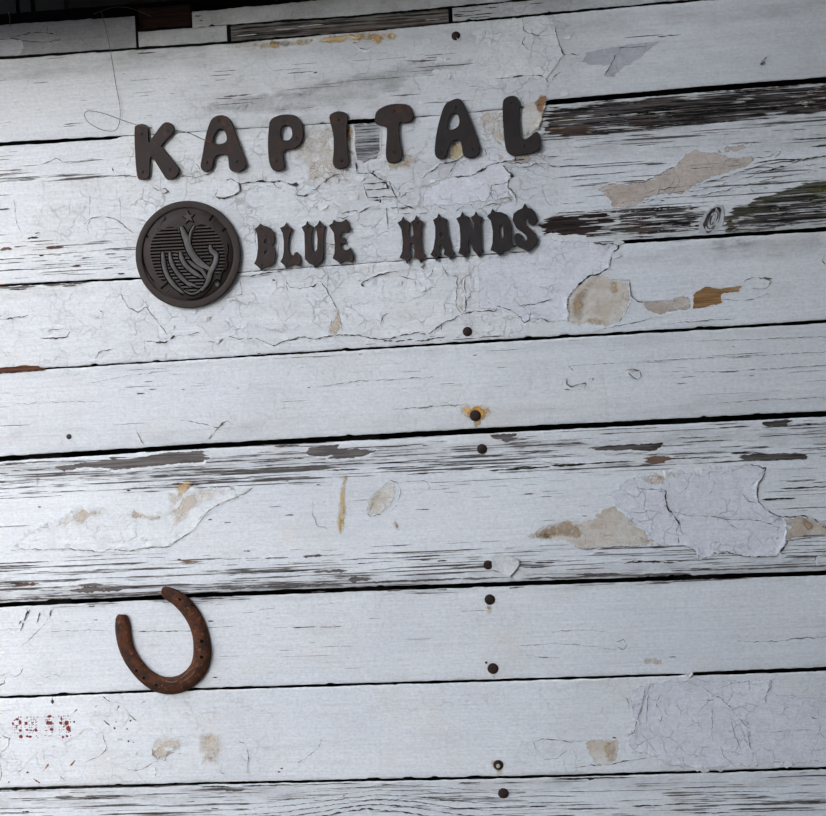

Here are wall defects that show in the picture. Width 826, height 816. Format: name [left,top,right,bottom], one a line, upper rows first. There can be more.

peeling [0,38,24,56]
crack [495,18,576,87]
peeling [521,83,826,148]
peeling [722,181,826,233]
peeling [384,143,801,351]
crack [40,329,70,339]
crack [119,265,551,349]
rust [463,406,490,425]
peeling [0,419,826,607]
peeling [586,671,826,773]
peeling [529,791,613,816]
peeling [634,784,826,816]